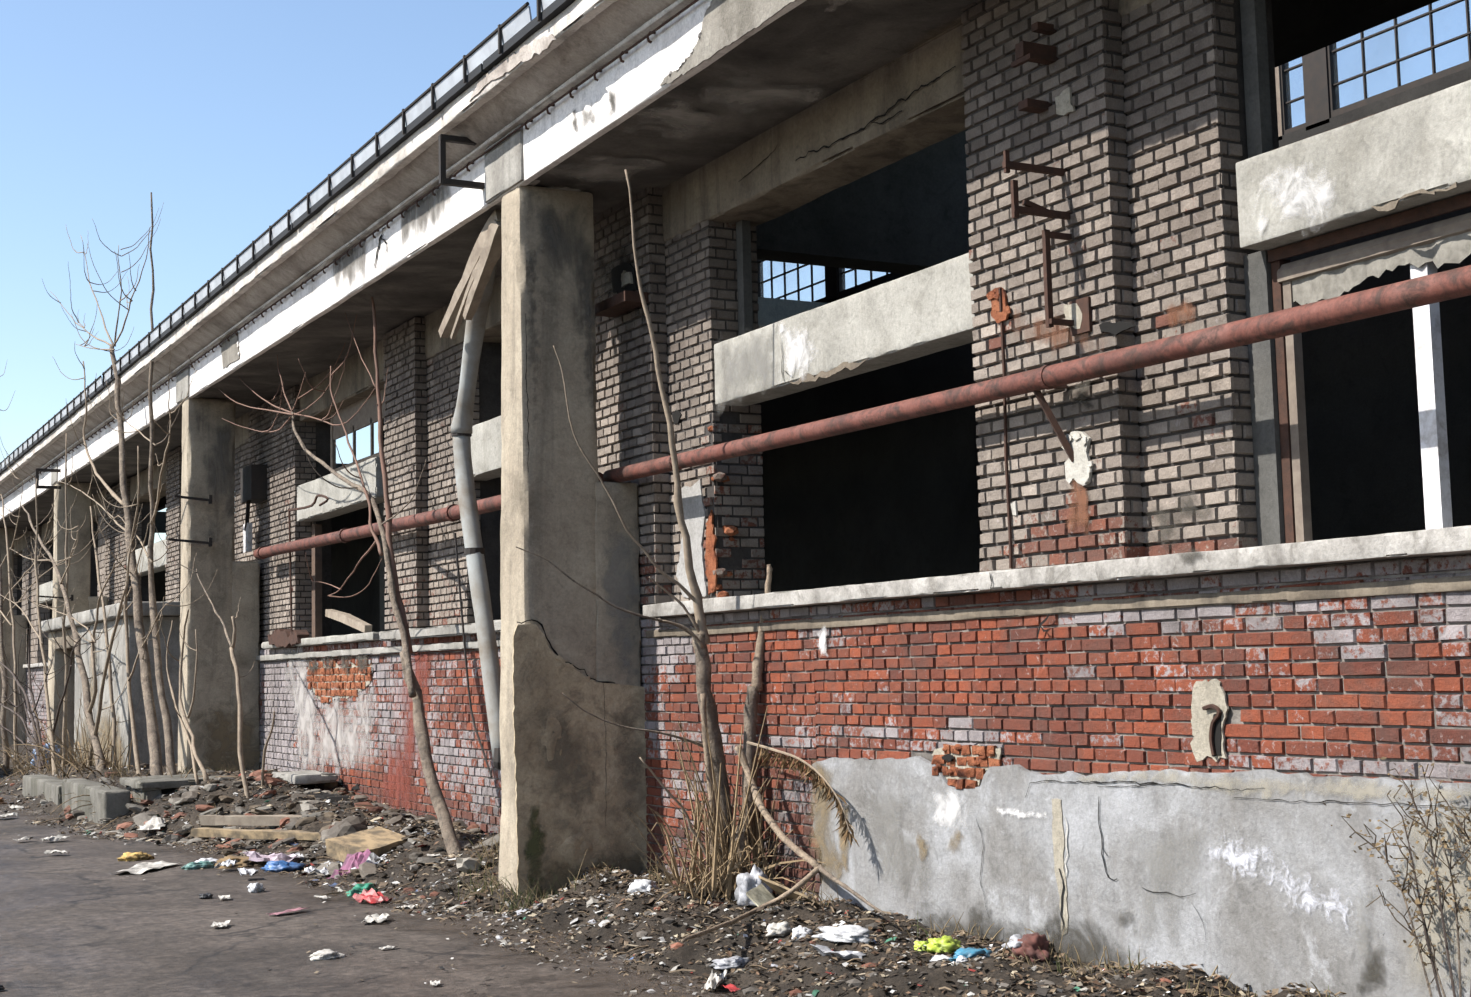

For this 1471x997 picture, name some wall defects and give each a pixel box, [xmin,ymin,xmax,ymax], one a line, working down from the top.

peeling [659,0,797,86]
crack [738,66,956,182]
spalling [268,629,309,648]
water stain [289,646,370,767]
spalling [306,657,373,703]
water stain [384,639,427,811]
crack [517,619,614,823]
spalling [931,744,1002,789]
crack [1025,780,1470,935]